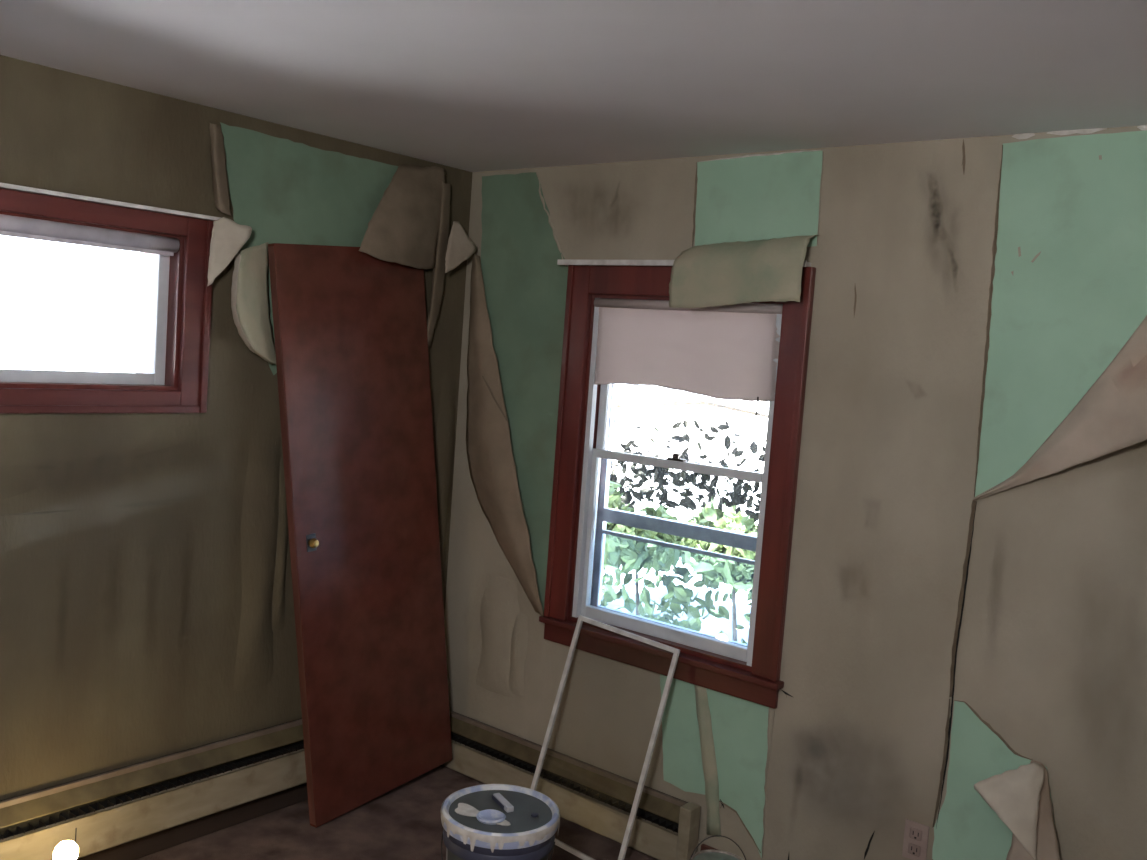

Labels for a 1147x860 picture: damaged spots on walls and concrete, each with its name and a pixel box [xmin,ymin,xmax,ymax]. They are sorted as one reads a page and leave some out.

flaking render [220,122,398,251]
flaking render [481,172,568,615]
flaking render [975,125,1147,497]
flaking render [660,674,769,858]
flaking render [932,701,1032,860]